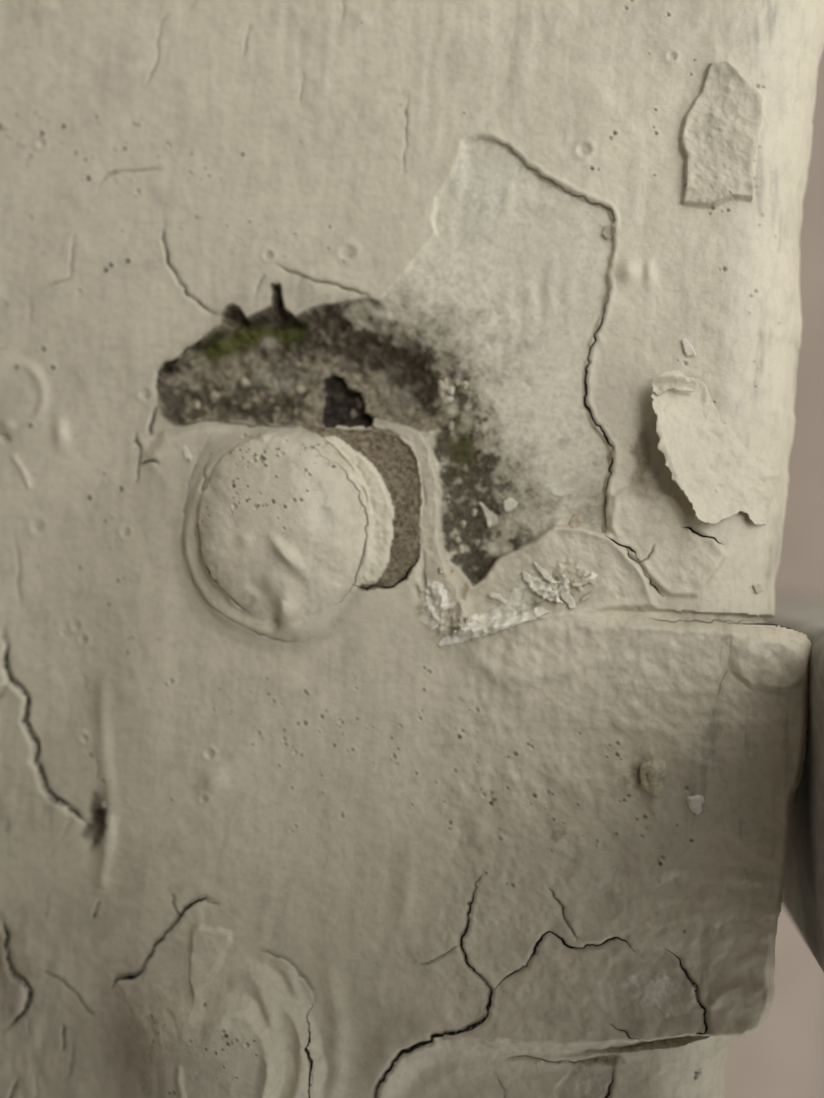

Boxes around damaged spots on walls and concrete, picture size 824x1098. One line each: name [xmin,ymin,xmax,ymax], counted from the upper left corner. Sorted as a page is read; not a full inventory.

crack [492,136,615,249]
peeling [680,61,763,208]
leakage [161,363,317,425]
leakage [202,289,532,583]
peeling [157,133,781,626]
crack [0,540,92,827]
crack [0,916,93,1032]
crack [111,895,219,990]
crack [376,875,635,1098]
crack [666,949,707,1035]
crack [10,1024,74,1098]